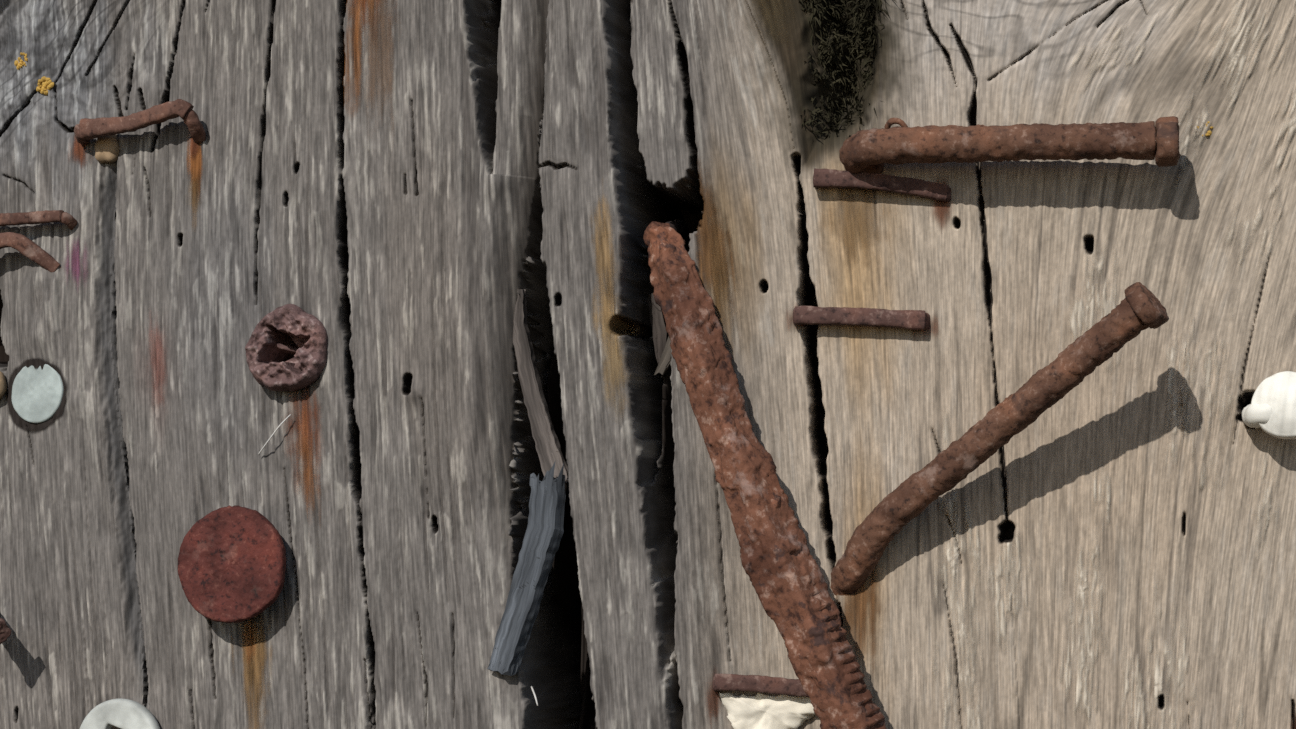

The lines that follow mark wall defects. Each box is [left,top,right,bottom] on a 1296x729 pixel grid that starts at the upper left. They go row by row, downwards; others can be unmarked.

rust [347,0,380,88]
crack [901,0,1147,126]
crack [539,162,577,170]
rust [698,180,733,310]
crack [976,161,999,406]
crack [794,156,836,567]
rust [289,393,319,460]
crack [999,446,1009,522]
crack [547,353,597,729]
rust [846,571,876,647]
rust [243,617,265,690]
rust [708,689,718,715]